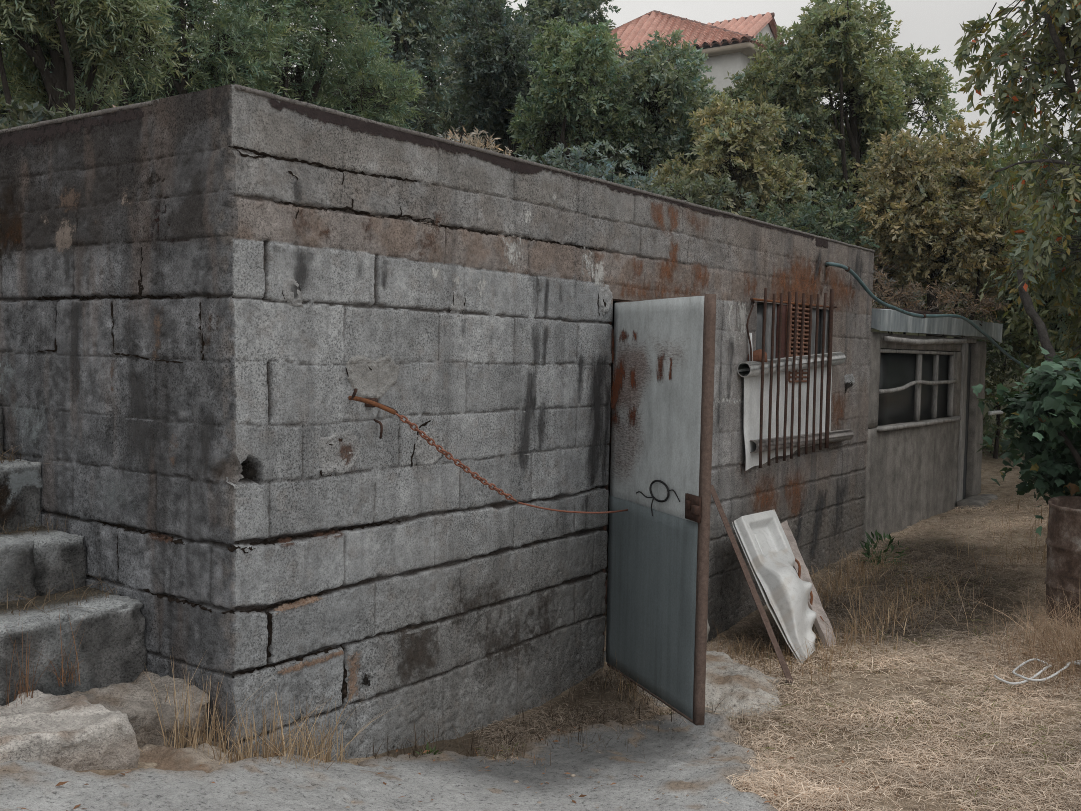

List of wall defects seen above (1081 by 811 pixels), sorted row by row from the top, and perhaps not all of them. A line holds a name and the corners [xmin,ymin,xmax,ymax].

water stain [520,328,548,468]
water stain [578,356,610,489]
rust [611,328,637,427]
rust [657,355,672,381]
spalling [226,461,257,490]